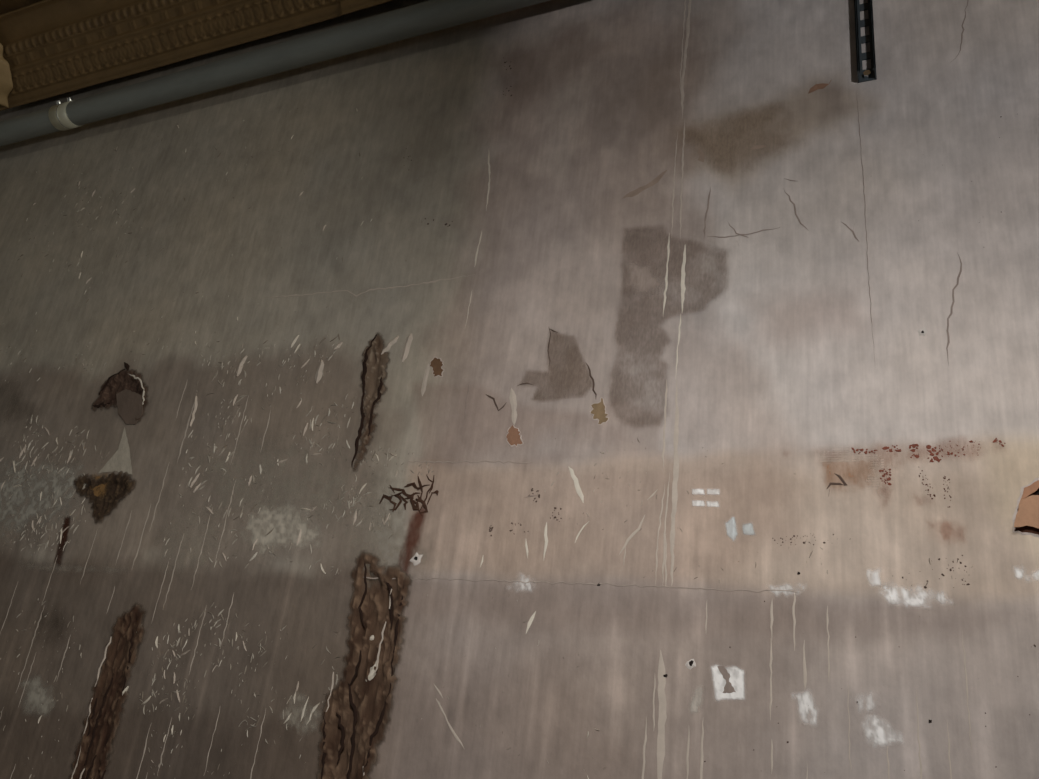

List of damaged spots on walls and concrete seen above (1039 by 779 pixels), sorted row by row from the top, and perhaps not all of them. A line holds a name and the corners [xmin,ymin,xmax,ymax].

leakage [622,123,685,313]
flaking render [0,330,163,556]
flaking render [179,331,433,779]
leakage [647,313,681,585]
flaking render [68,603,299,779]